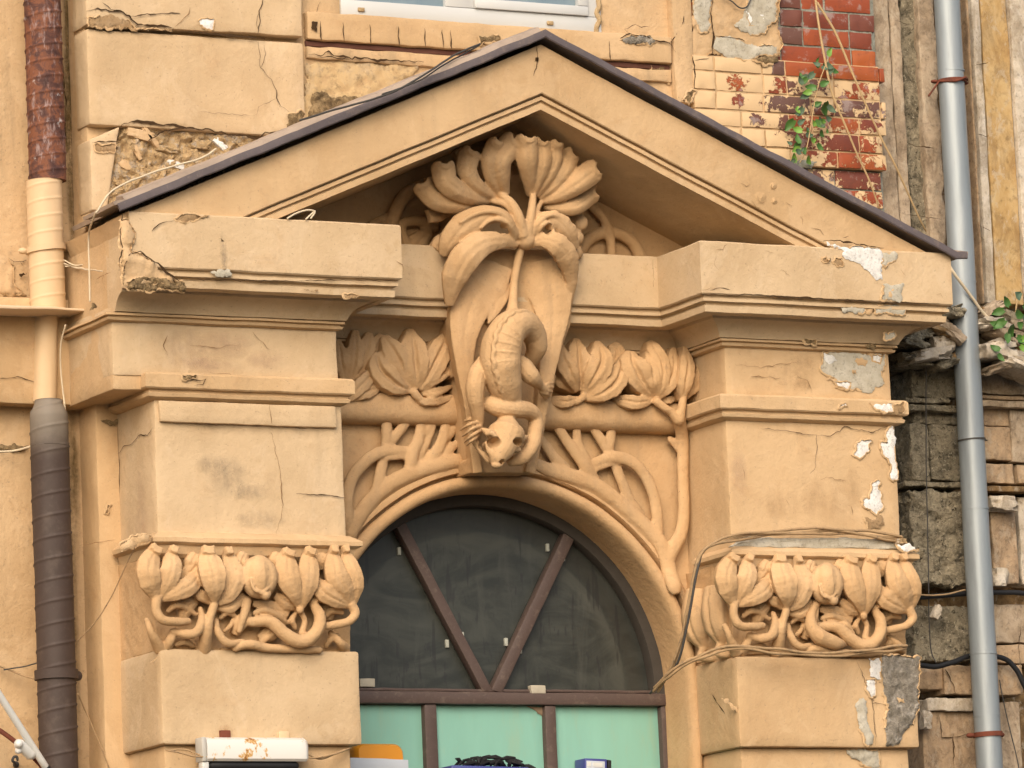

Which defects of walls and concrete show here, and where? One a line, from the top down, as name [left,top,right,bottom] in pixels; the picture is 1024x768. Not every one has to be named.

rust [23,0,67,183]
peeling [198,17,215,32]
crack [209,0,288,116]
flaking render [286,50,422,127]
peeling [692,0,784,67]
spalling [93,120,273,154]
spalling [117,217,186,294]
peeling [821,242,906,317]
crack [269,406,344,530]
crack [766,426,887,481]
peeling [802,330,906,530]
spalling [846,653,933,768]